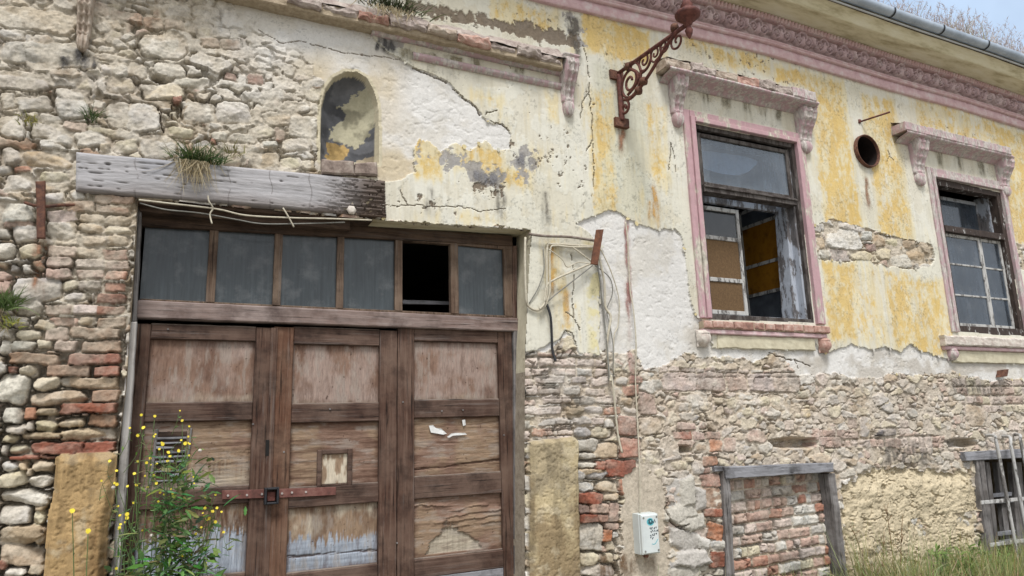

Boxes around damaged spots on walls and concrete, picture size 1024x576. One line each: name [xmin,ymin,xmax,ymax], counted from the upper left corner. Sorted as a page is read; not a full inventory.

crack [258,29,512,147]
crack [580,45,595,187]
crack [385,189,506,212]
spalling [218,0,1024,576]